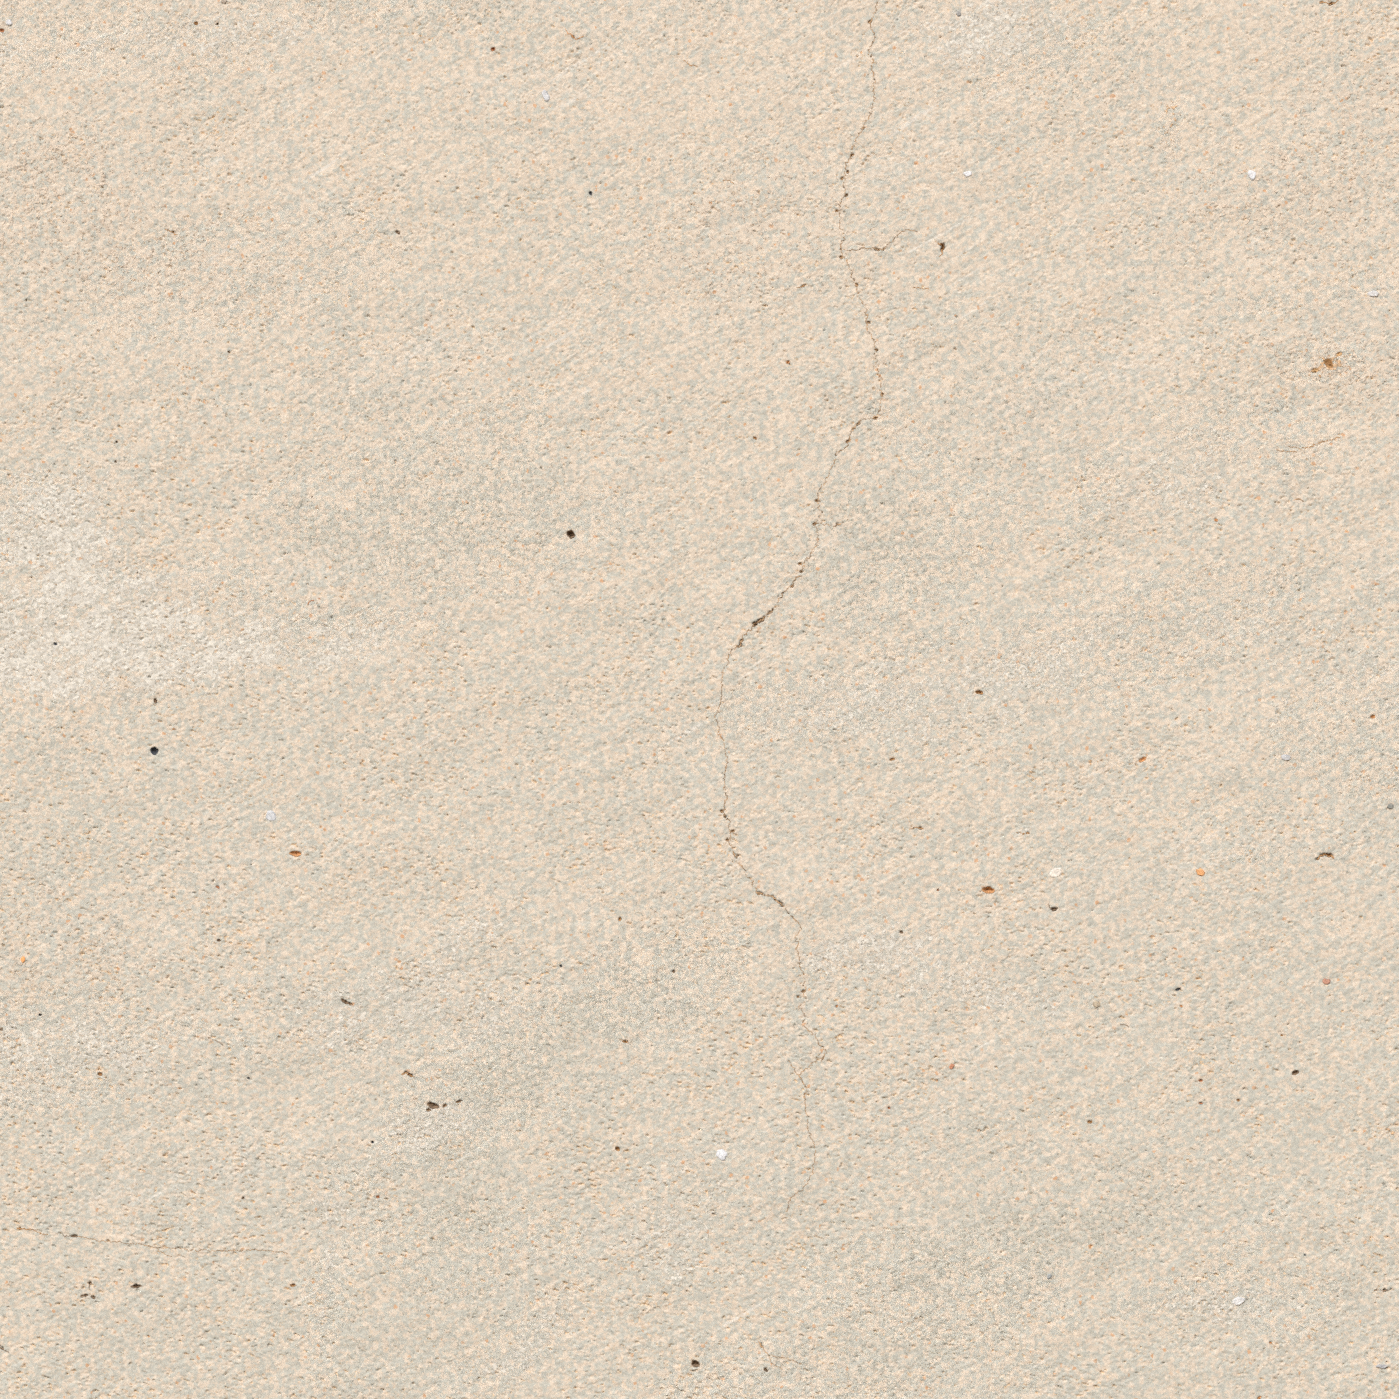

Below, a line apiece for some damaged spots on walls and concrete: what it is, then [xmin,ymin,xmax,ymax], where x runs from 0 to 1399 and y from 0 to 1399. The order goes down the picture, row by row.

crack [714,2,918,1211]